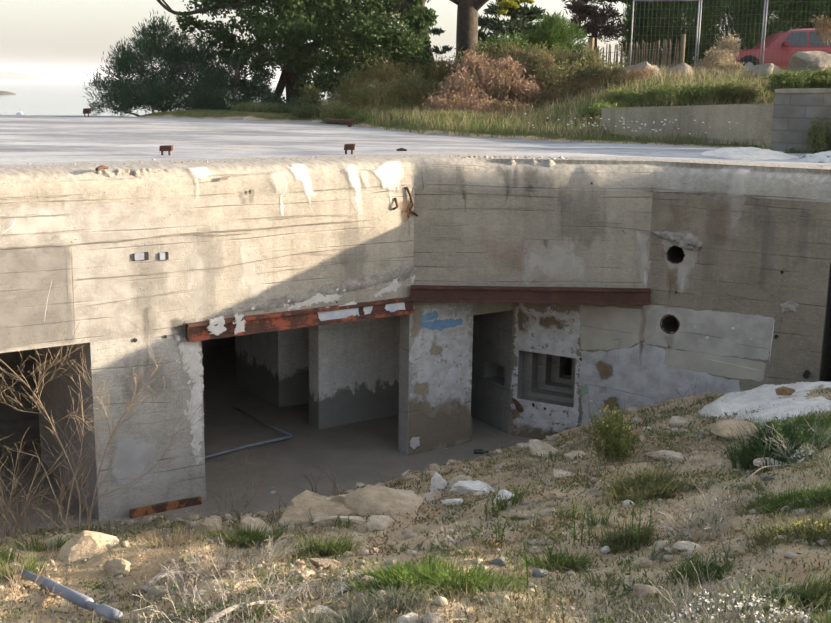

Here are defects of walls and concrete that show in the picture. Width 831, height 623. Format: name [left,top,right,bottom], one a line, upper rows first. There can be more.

leakage [190,167,207,178]
leakage [291,164,313,198]
leakage [346,166,360,210]
leakage [374,161,402,203]
spalling [183,266,417,327]
peeling [409,305,473,408]
peeling [511,303,741,433]
peeling [175,334,205,464]